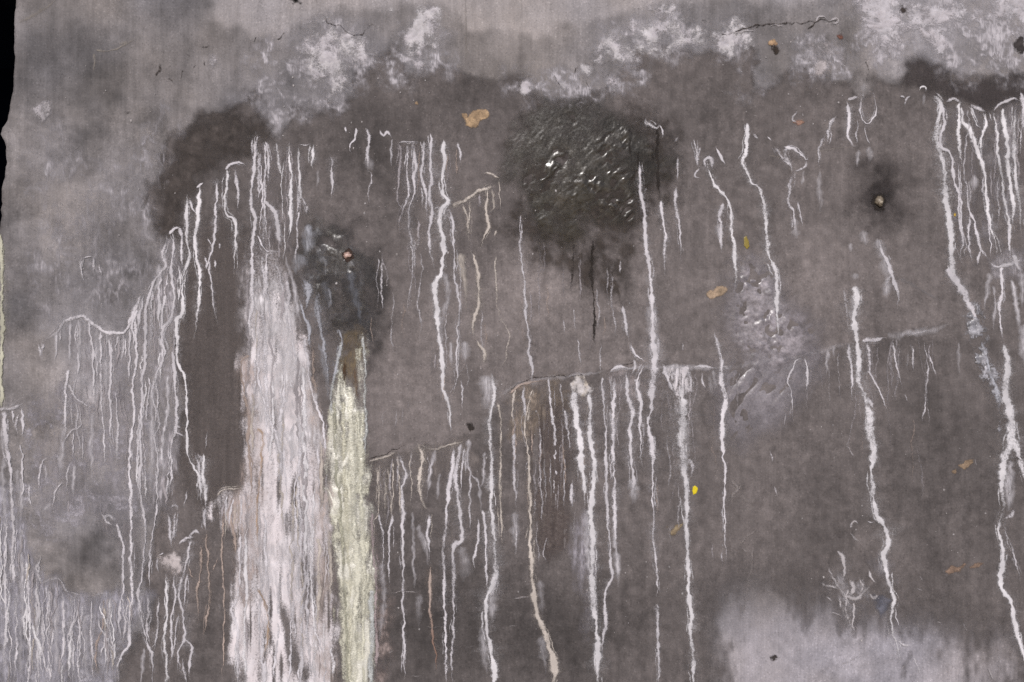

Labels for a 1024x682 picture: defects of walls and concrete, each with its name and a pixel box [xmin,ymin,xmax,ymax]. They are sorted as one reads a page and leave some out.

crack [704,15,839,35]
damp [257,39,278,64]
damp [33,102,51,122]
damp [268,88,285,130]
damp [32,224,135,306]
damp [55,337,129,466]
damp [21,409,46,450]
damp [1,412,19,582]
damp [16,445,35,508]